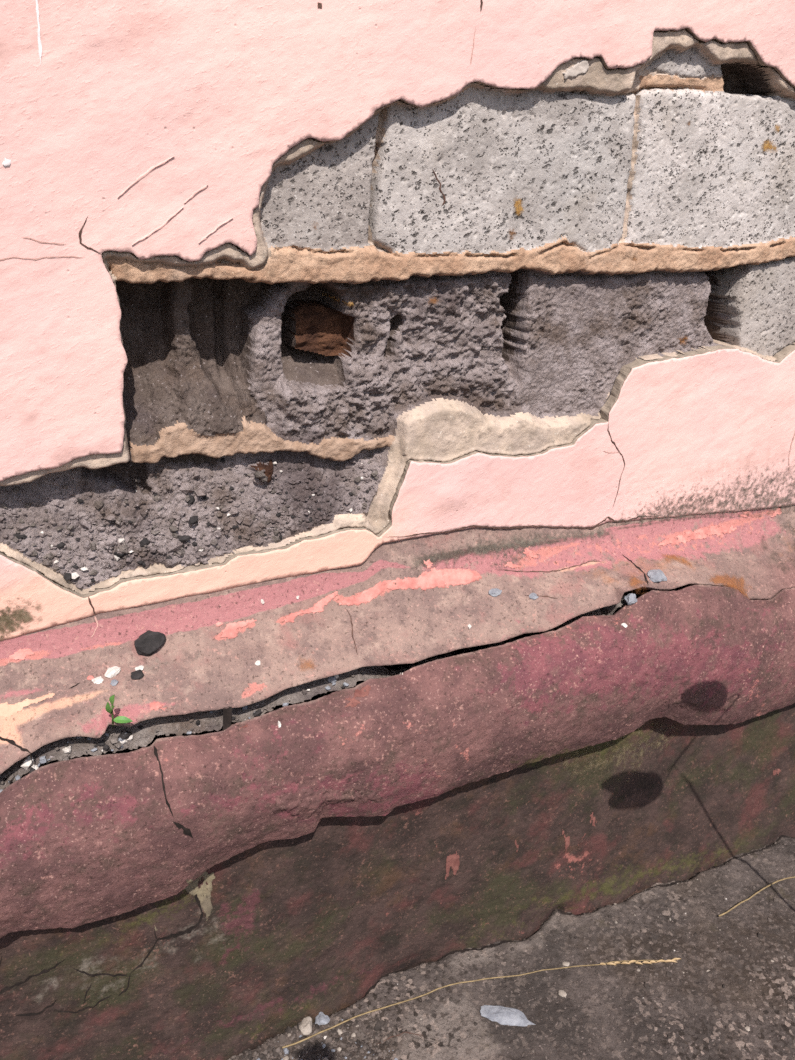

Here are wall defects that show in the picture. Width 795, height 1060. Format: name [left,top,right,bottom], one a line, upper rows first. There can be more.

crack [0,216,101,261]
spalling [0,29,795,594]
crack [401,422,661,537]
mould [641,469,795,524]
mould [0,604,41,640]
peeling [216,619,257,639]
peeling [283,559,482,623]
crack [0,555,648,838]
crack [0,882,204,1016]